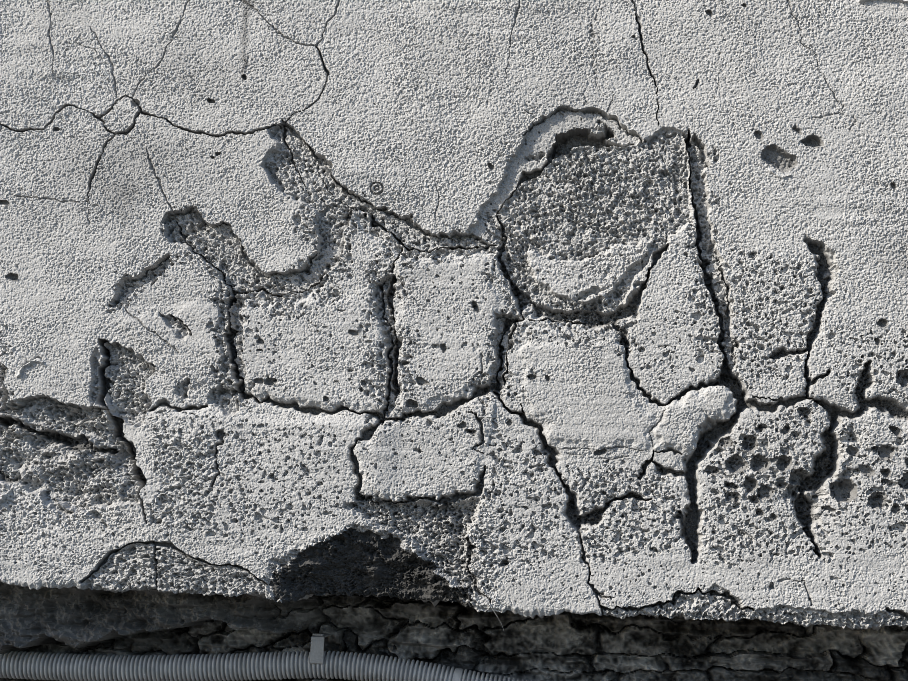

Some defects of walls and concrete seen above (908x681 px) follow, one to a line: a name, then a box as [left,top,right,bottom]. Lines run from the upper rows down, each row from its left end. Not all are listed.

crack [0,0,342,244]
crack [630,0,660,126]
spalling [108,105,740,426]
spalling [0,338,156,529]
crack [95,338,147,524]
crack [148,398,208,413]
crack [209,429,227,488]
spalling [340,465,492,604]
crack [215,236,908,616]
spalling [700,407,821,531]
spalling [821,424,908,532]
spalling [600,583,908,629]